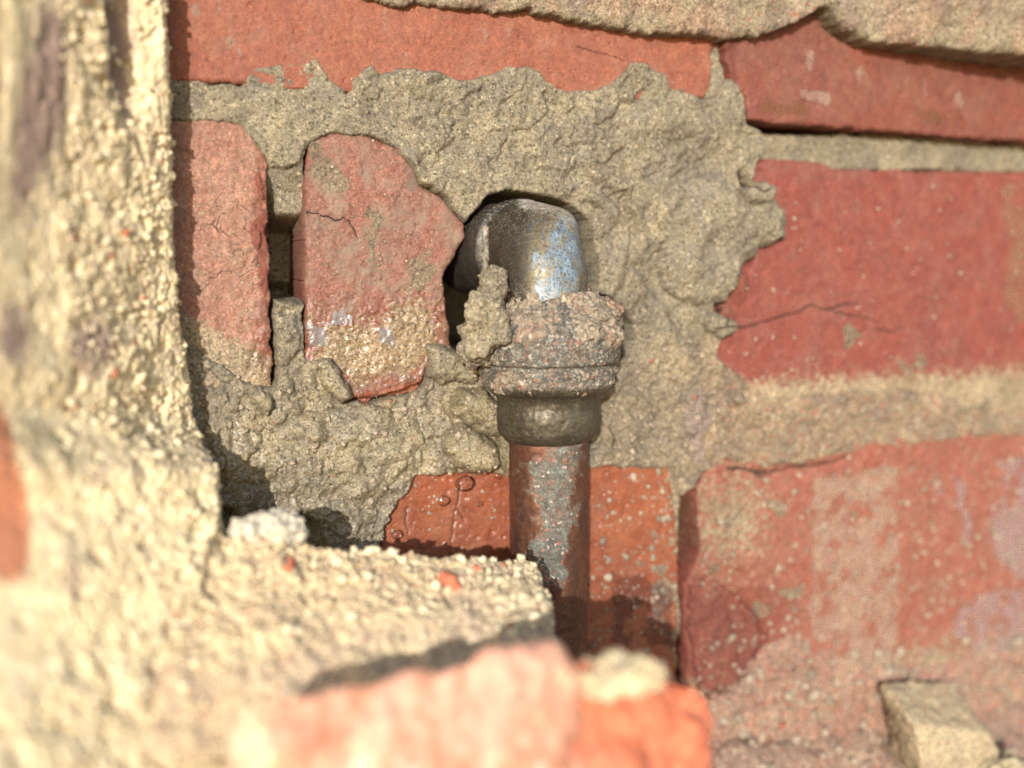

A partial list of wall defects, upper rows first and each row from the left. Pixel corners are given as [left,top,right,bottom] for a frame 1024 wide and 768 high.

crack [737,172,771,193]
crack [306,211,358,238]
crack [197,194,258,293]
crack [715,303,905,332]